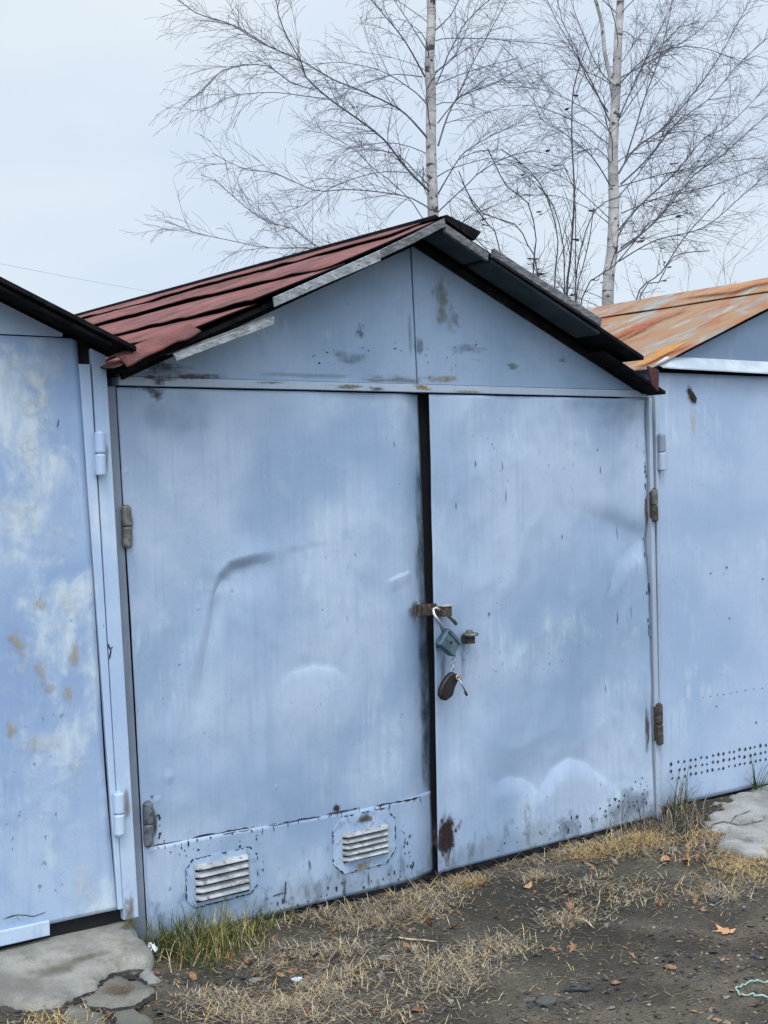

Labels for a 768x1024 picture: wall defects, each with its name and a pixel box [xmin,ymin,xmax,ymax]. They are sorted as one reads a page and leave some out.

rust [690,279,768,296]
rust [613,309,683,340]
rust [635,343,683,366]
rust [438,819,457,857]